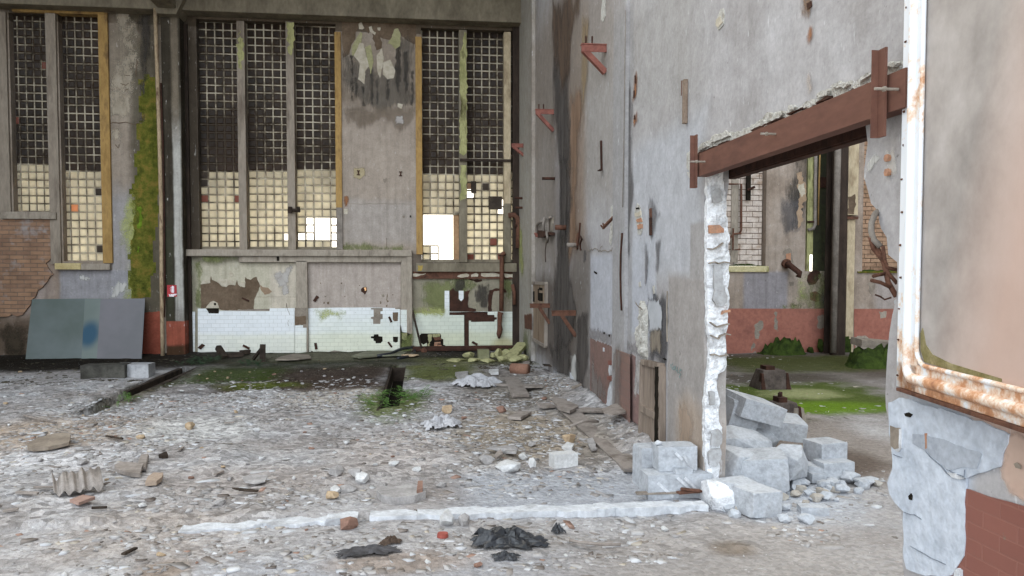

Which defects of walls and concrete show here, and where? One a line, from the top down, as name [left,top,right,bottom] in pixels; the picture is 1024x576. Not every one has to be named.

water stain [138,15,150,95]
peeling [341,22,416,84]
spalling [686,72,871,178]
water stain [550,0,641,415]
peeling [200,272,272,313]
peeling [295,308,307,328]
spalling [634,285,655,360]
spalling [699,172,735,511]
corrosion [868,237,897,298]
spalling [887,398,1021,576]